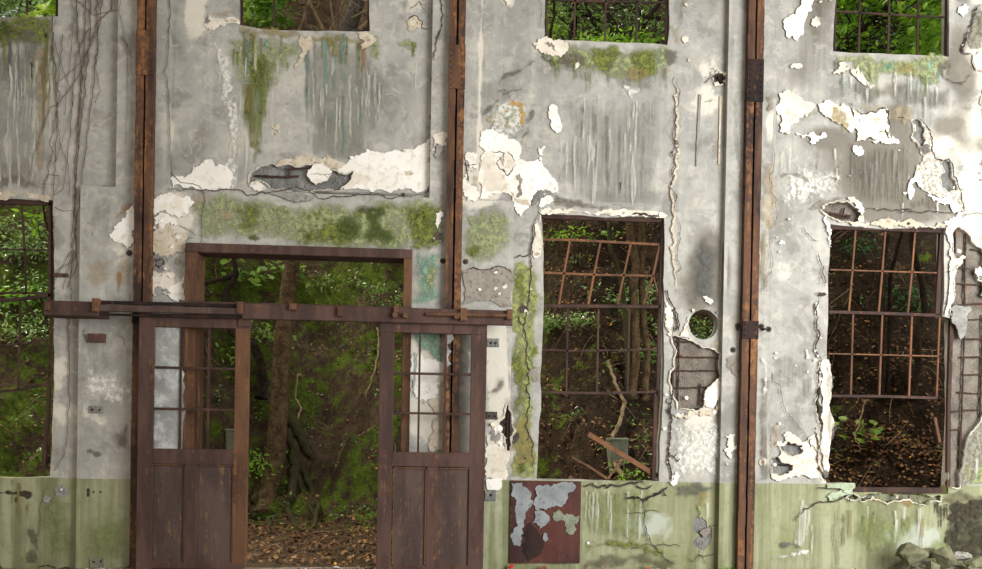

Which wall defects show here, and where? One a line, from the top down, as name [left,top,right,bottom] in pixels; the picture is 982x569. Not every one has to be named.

water stain [214,34,379,188]
peeling [248,132,448,193]
peeling [463,127,668,258]
water stain [555,197,602,208]
water stain [581,108,621,185]
crack [632,76,681,332]
spalling [821,118,982,489]
rust [522,522,544,561]
crack [582,391,716,565]
crack [795,231,862,566]
flaking render [771,350,943,506]
water stain [936,465,982,557]